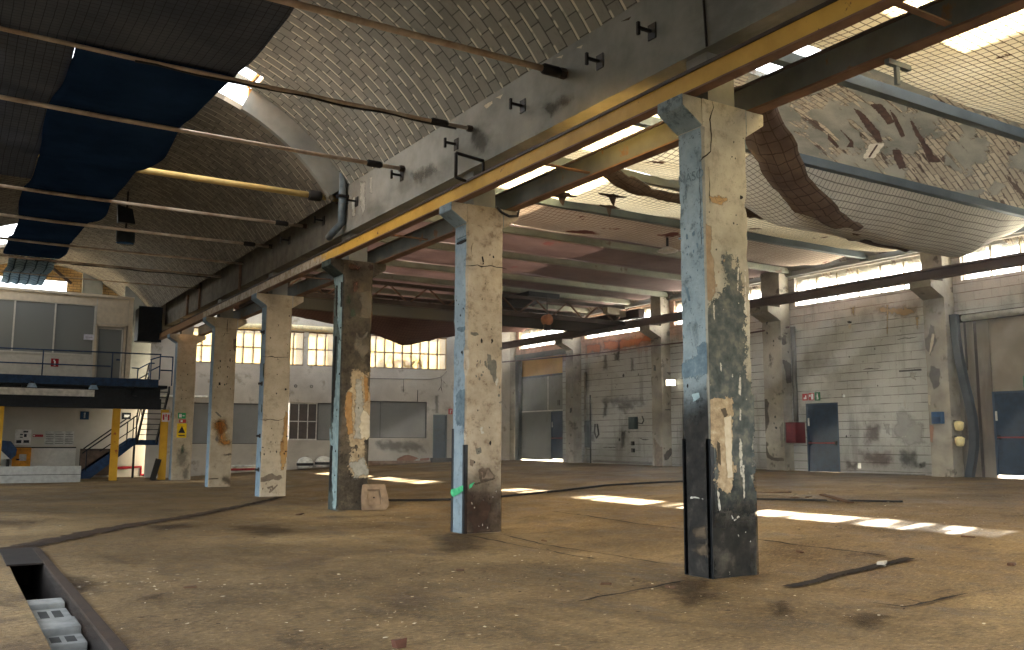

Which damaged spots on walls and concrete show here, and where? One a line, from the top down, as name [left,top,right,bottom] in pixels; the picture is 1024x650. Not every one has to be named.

flaking render [828,104,941,169]
spalling [329,274,371,509]
peeling [654,211,784,508]
corrosion [214,420,230,445]
water stain [847,426,925,475]